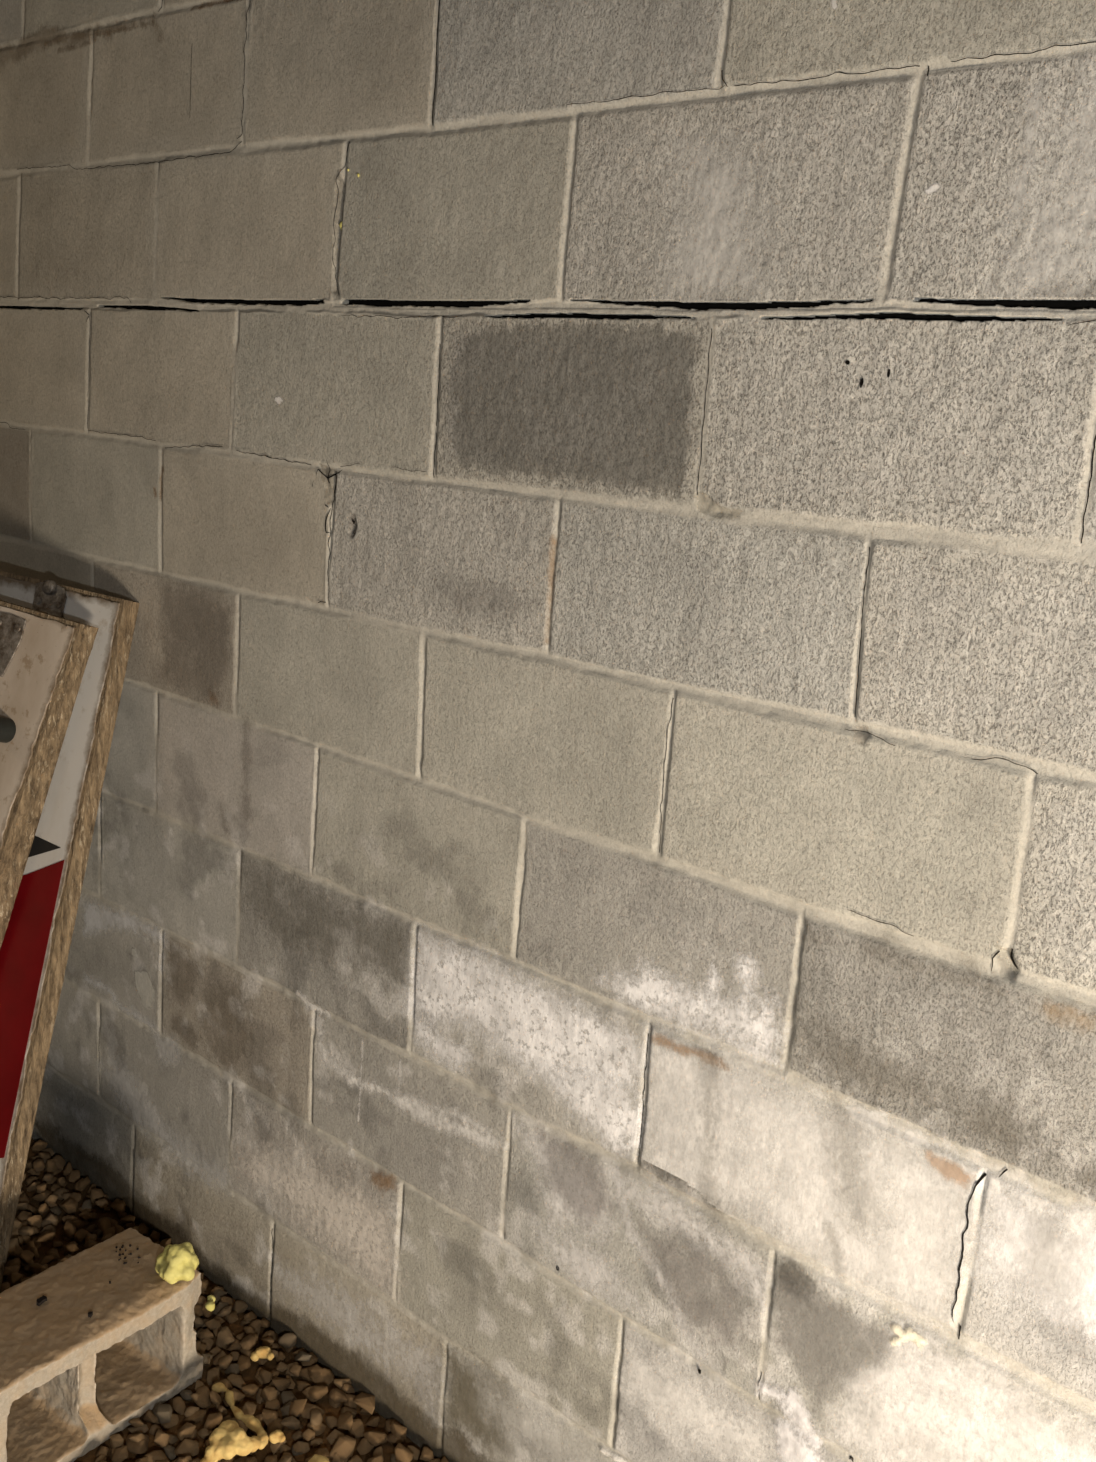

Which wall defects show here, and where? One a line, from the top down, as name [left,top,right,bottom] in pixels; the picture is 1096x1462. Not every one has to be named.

crack [0,142,1096,603]
damp [34,1122,517,1462]
damp [296,991,507,1148]
damp [407,933,1096,1462]
crack [952,1169,1008,1339]